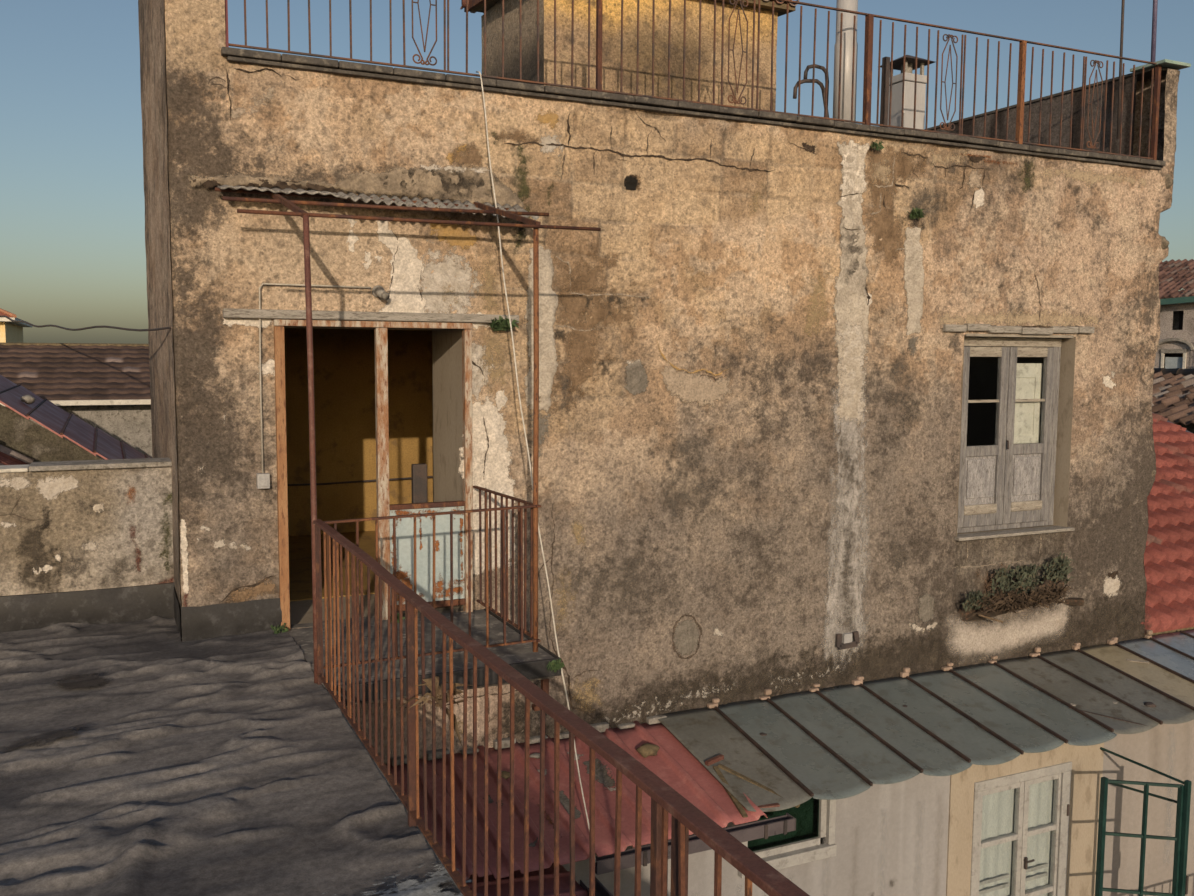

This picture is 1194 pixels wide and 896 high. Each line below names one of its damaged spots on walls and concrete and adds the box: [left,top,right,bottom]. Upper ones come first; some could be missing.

crack [504,110,774,181]
flaking render [346,216,517,575]
water stain [889,347,925,438]
water stain [656,424,728,521]
rust [391,509,465,603]
crack [538,504,596,719]
water stain [567,537,676,619]
flaking render [1103,570,1122,597]
water stain [583,592,1148,727]
water stain [455,700,531,747]